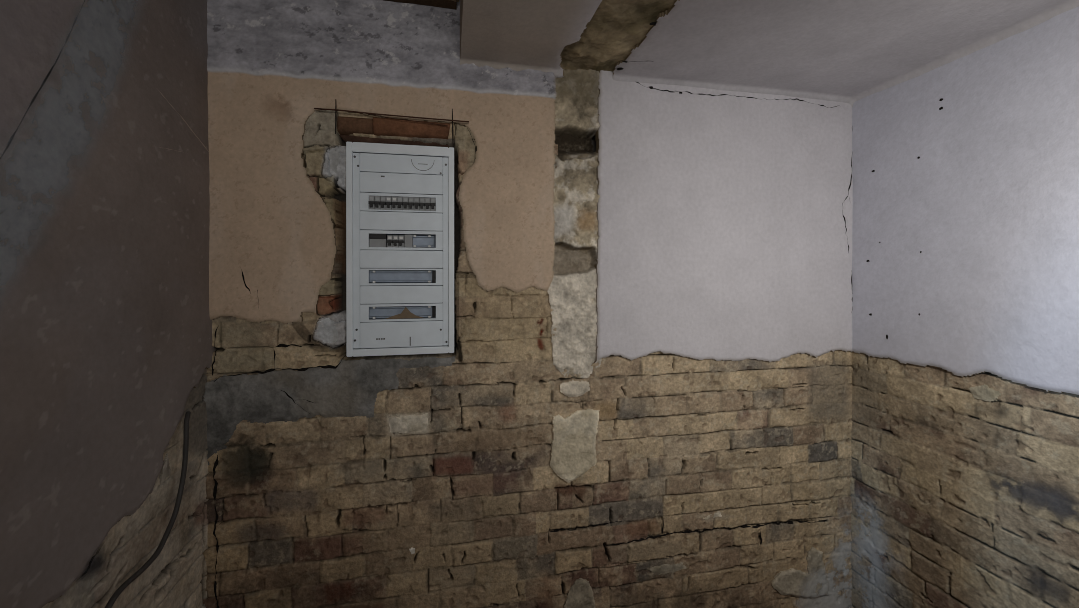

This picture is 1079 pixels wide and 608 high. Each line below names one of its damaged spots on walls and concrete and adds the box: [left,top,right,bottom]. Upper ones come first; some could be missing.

crack [631,61,839,108]
crack [842,158,853,310]
flaking render [42,110,1079,608]
crack [213,455,224,608]
crack [550,520,827,546]
water stain [993,480,1078,518]